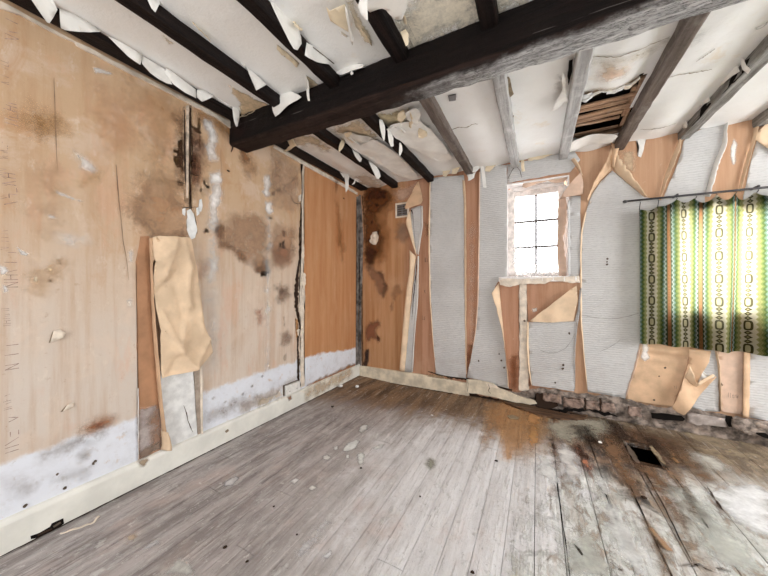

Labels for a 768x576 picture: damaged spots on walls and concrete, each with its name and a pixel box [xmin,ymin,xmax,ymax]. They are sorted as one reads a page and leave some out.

leakage [210,173,294,272]
crack [287,164,306,388]
leakage [360,176,408,296]
leakage [363,321,380,366]